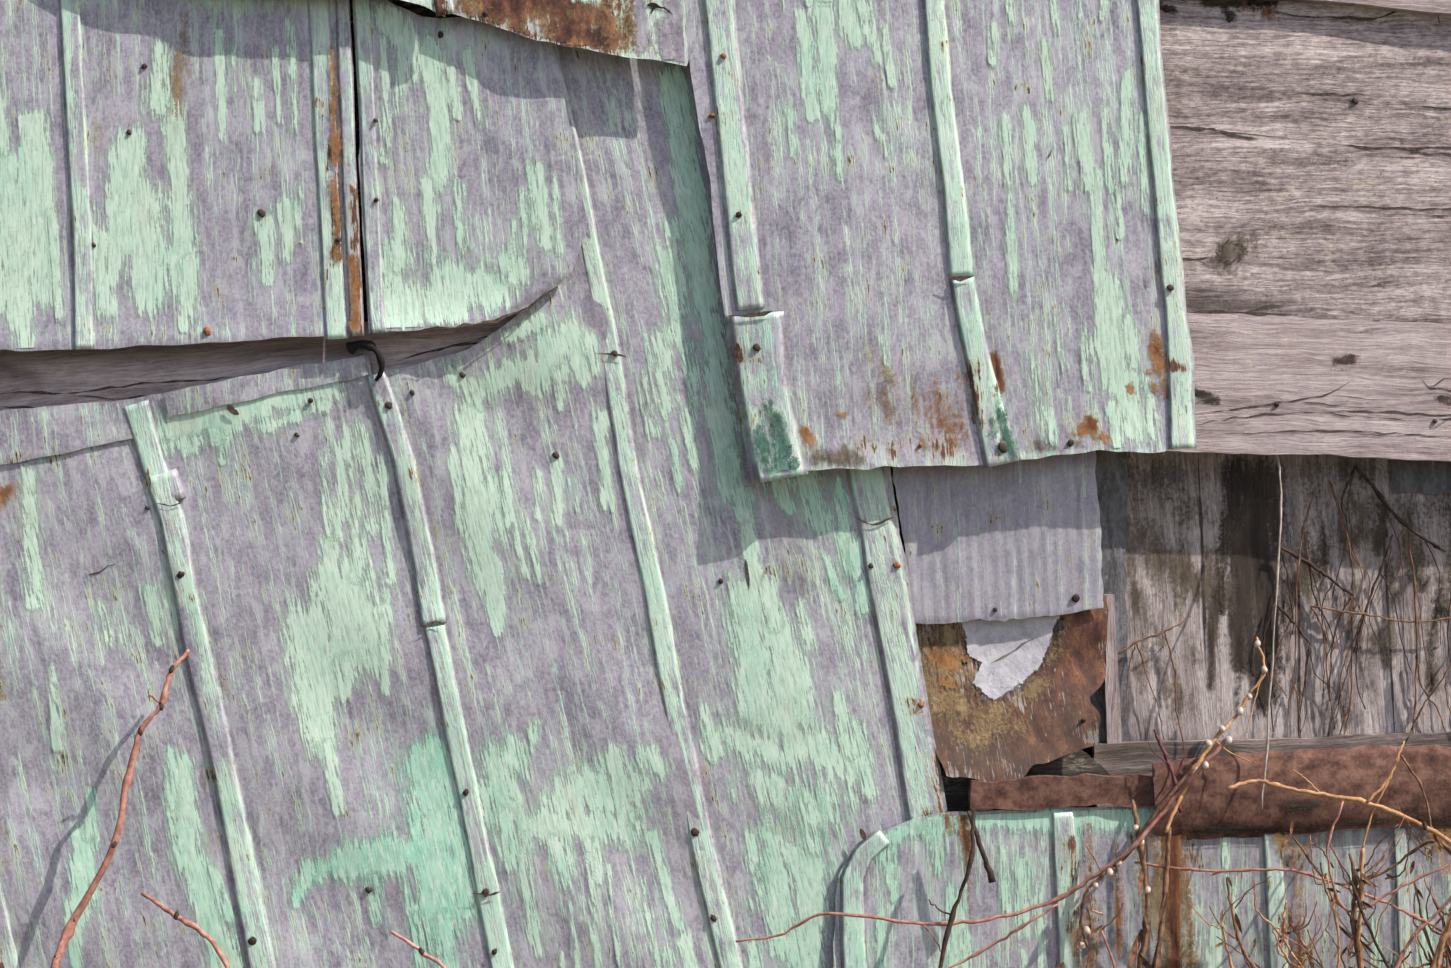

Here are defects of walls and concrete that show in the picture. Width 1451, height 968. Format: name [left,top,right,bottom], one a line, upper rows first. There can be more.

corrosion [455,0,637,53]
peeling [91,38,200,343]
peeling [155,382,397,818]
peeling [371,2,600,638]
peeling [632,0,879,968]
corrosion [990,351,1005,393]
corrosion [1068,414,1111,444]
peeling [1054,69,1159,449]
corrosion [1125,327,1169,399]
water stain [1126,454,1451,725]
peeling [474,718,698,968]
corrosion [943,773,1386,968]